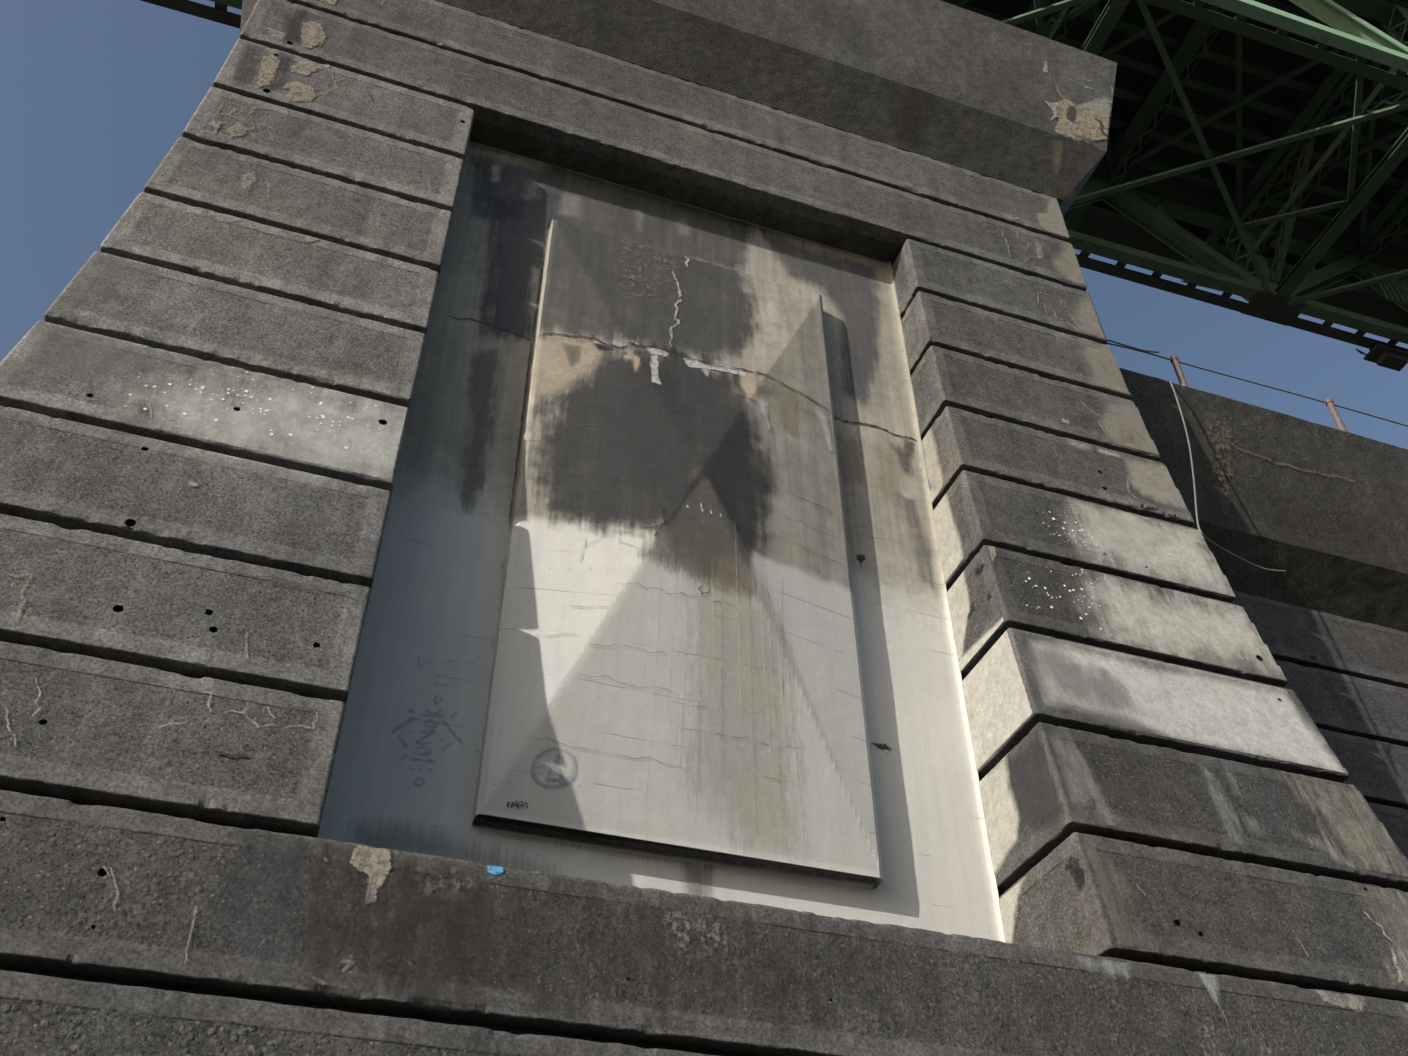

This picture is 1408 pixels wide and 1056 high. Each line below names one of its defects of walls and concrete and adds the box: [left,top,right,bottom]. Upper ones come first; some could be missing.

peeling [256,0,341,102]
spalling [1045,86,1113,142]
water stain [474,159,772,594]
crack [450,219,917,577]
water stain [816,409,857,450]
crack [549,582,811,781]
peeling [348,845,391,904]